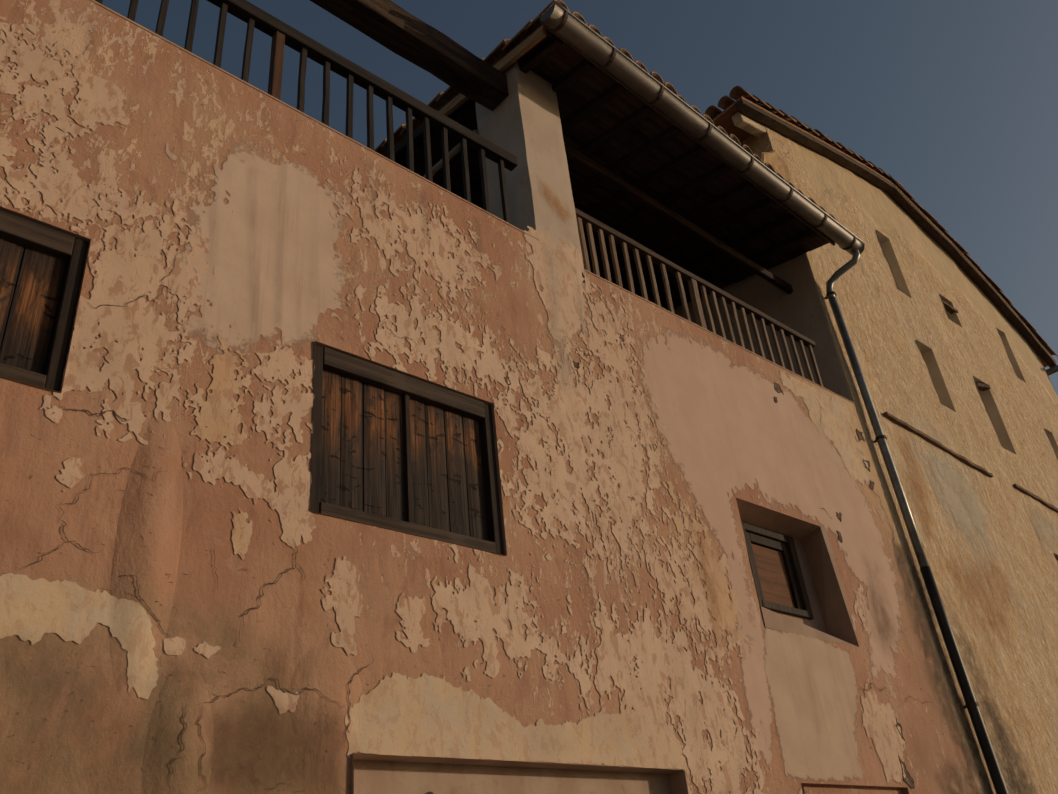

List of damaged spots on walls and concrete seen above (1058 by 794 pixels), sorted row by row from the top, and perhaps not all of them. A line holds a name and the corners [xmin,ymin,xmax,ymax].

flaking render [761,150,792,182]
peeling [0,23,316,560]
peeling [772,368,875,490]
crack [16,467,169,569]
peeling [0,573,221,699]
crack [118,575,173,641]
crack [232,539,306,660]
crack [169,651,374,794]
peeling [267,686,300,714]
peeling [858,684,915,789]